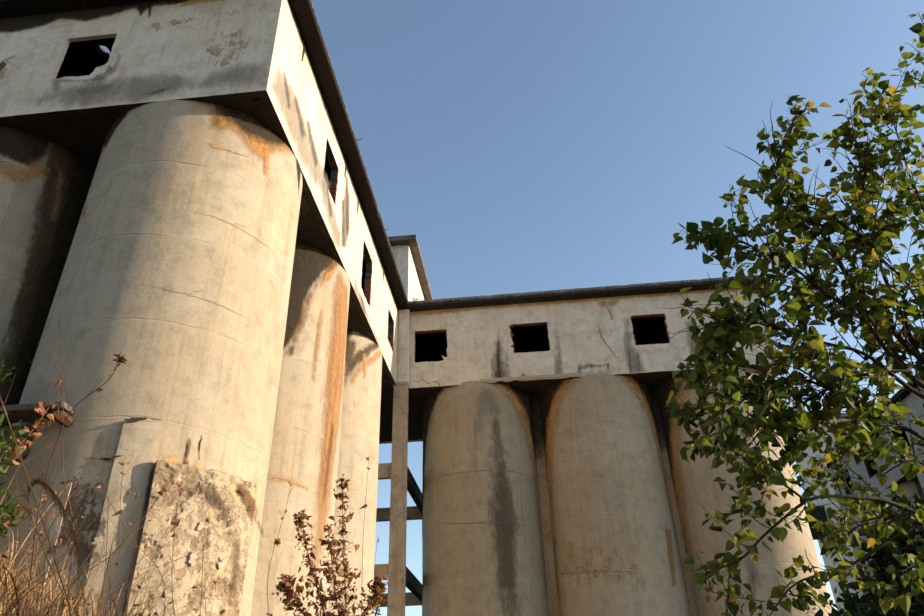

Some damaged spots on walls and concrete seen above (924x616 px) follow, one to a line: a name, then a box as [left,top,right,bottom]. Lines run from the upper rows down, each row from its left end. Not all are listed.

damp [0,0,214,32]
damp [64,78,182,103]
corrosion [214,111,287,156]
damp [275,0,398,311]
damp [0,142,77,406]
corrosion [314,259,381,561]
spalling [238,484,263,534]
damp [492,457,516,616]